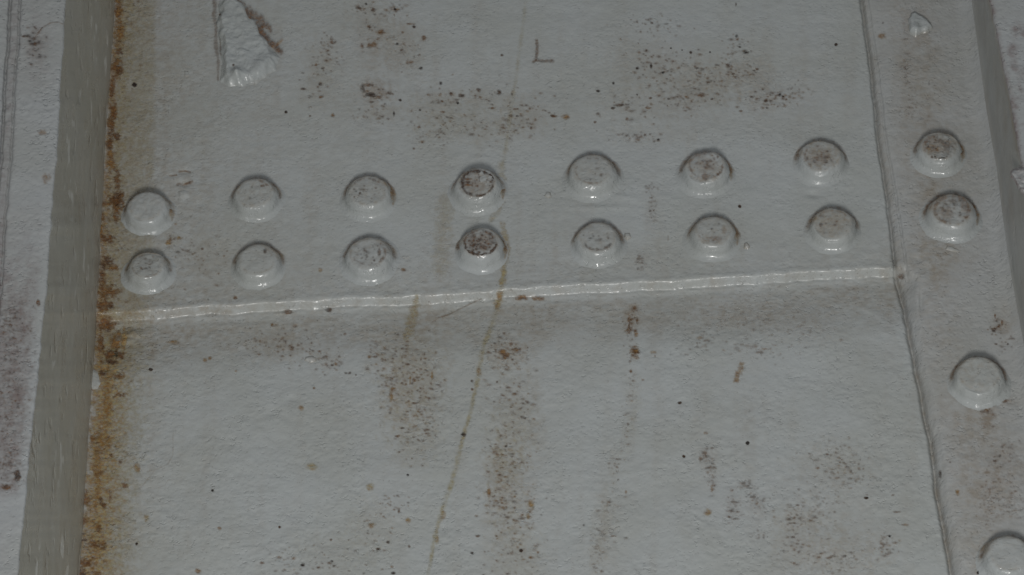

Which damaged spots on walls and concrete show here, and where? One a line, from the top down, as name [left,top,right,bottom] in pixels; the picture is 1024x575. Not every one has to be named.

rust [461,170,494,197]
rust [463,231,507,256]
rust [79,0,132,575]